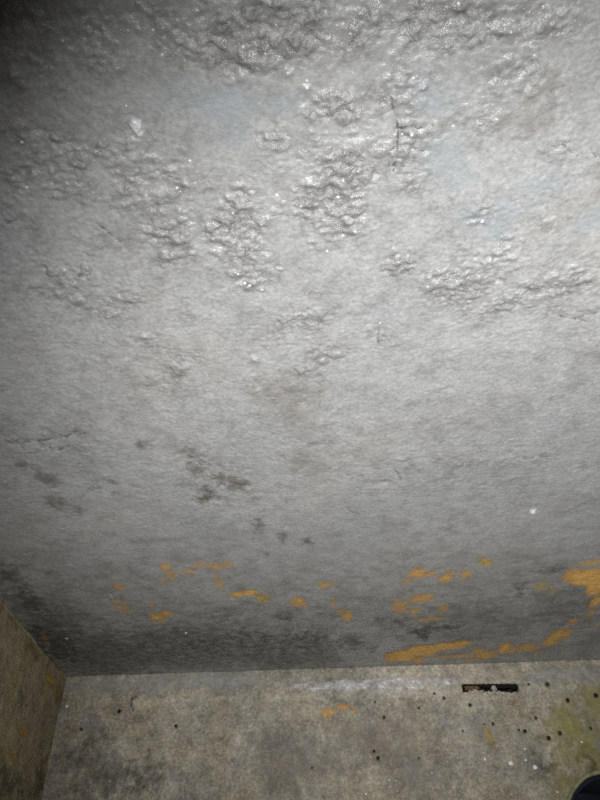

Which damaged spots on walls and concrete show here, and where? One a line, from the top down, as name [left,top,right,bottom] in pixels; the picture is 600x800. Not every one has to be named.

rust [564,561,600,613]
rust [543,630,572,646]
rust [386,640,534,663]